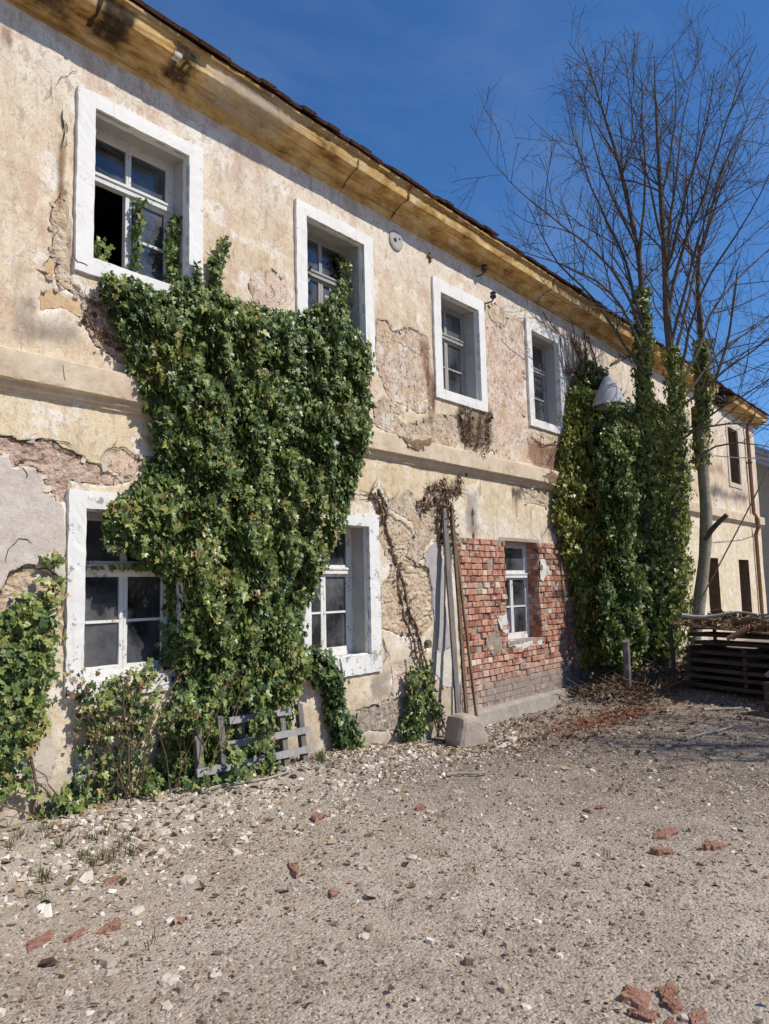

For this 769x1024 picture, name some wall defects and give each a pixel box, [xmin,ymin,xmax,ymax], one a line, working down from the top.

damp [93,0,135,50]
damp [163,44,195,89]
flaking render [35,190,137,364]
peeling [373,320,459,448]
flaking render [0,436,150,502]
crack [3,538,66,587]
flaking render [355,492,453,733]